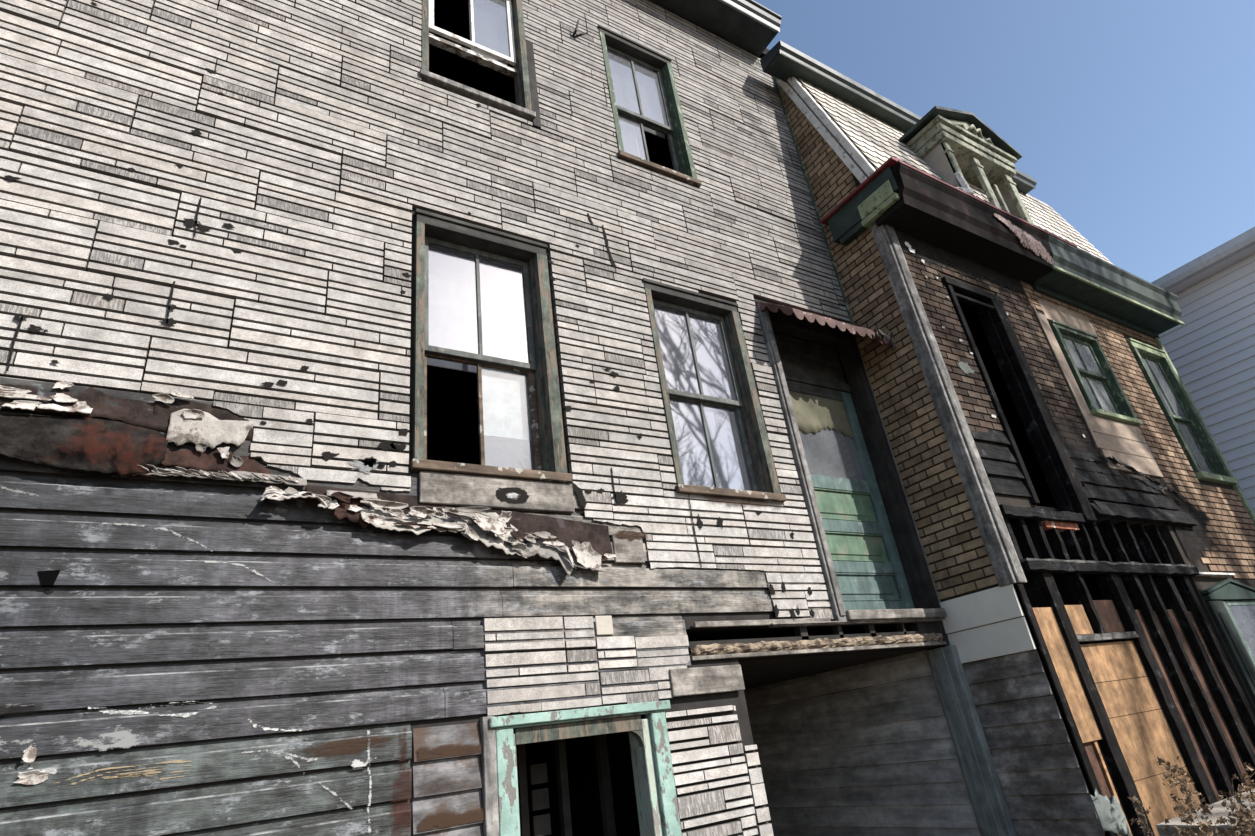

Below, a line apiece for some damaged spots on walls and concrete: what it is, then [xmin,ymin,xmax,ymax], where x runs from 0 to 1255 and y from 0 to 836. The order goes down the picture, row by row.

peeling [0,375,205,431]
peeling [196,443,244,467]
spalling [358,428,408,469]
spalling [585,488,628,504]
peeling [258,486,617,570]
spalling [688,632,943,656]
peeling [0,739,57,785]